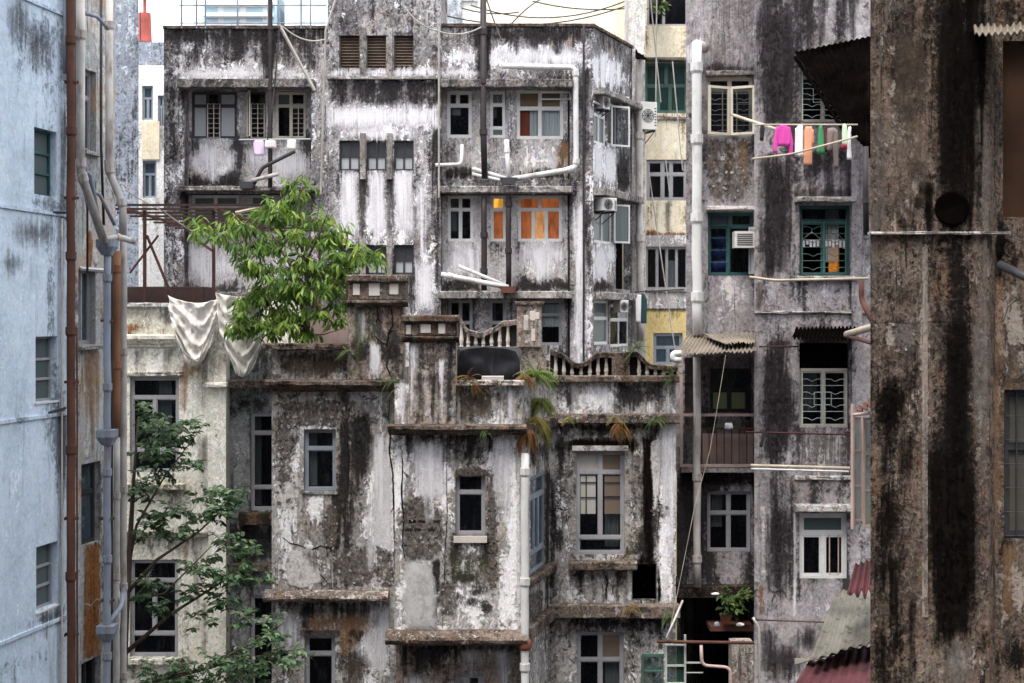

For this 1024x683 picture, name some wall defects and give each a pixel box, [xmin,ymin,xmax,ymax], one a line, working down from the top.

leakage [327,27,629,310]
leakage [914,0,985,231]
corrosion [83,543,101,658]
crack [375,308,409,559]
leakage [340,394,534,626]
leakage [763,339,797,617]